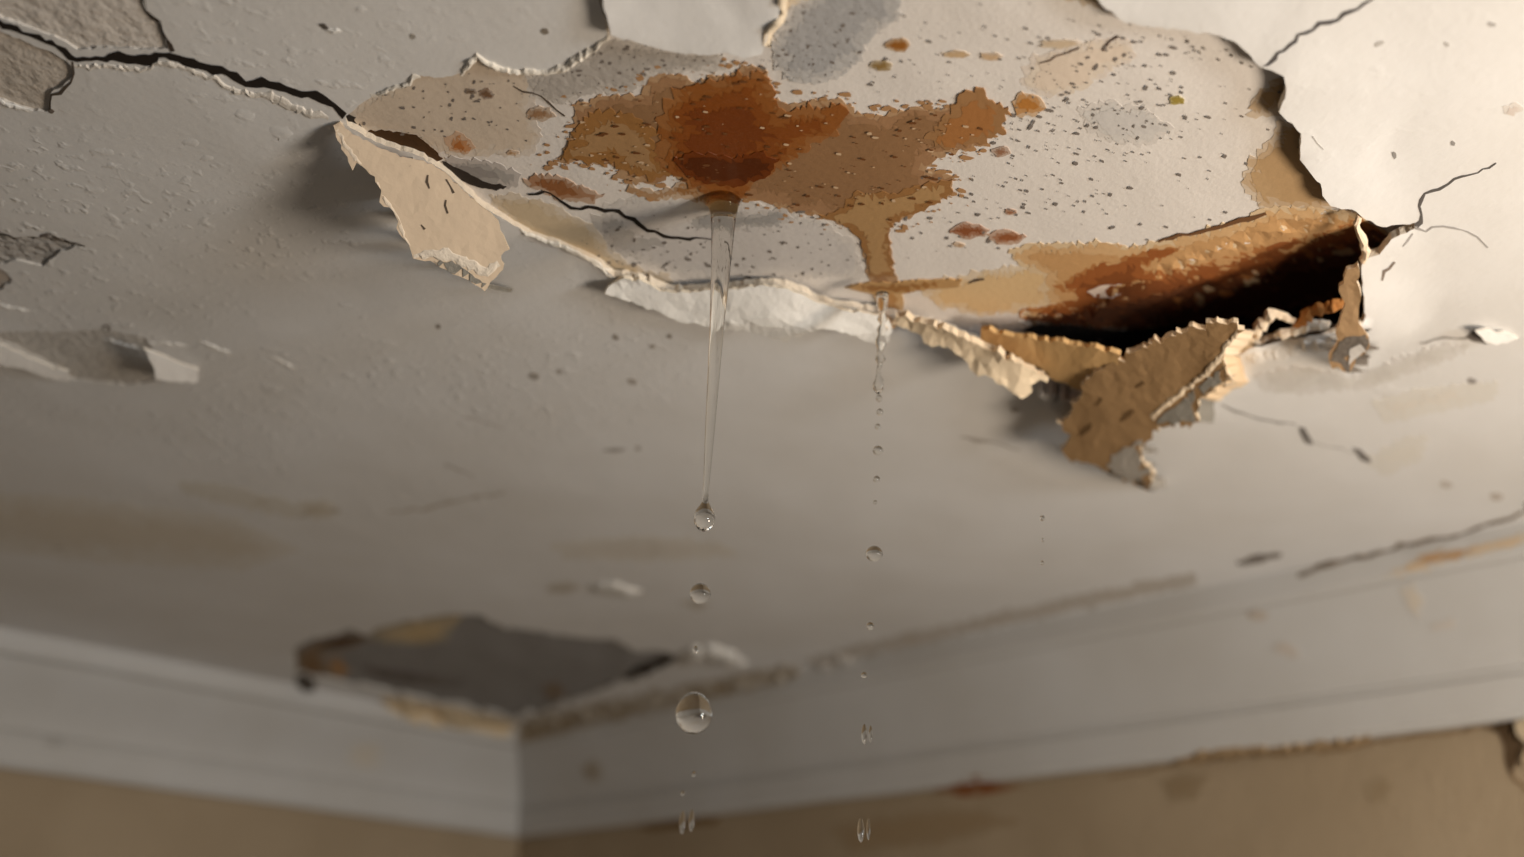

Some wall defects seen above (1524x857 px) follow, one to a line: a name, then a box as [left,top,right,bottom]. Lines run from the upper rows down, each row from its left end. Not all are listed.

crack [0,0,362,127]
crack [1263,0,1372,67]
spalling [0,234,75,264]
damp [350,0,1133,331]
spalling [333,0,1380,491]
spalling [1319,207,1406,233]
crack [1381,163,1497,281]
spalling [0,325,199,384]
spalling [295,614,677,739]